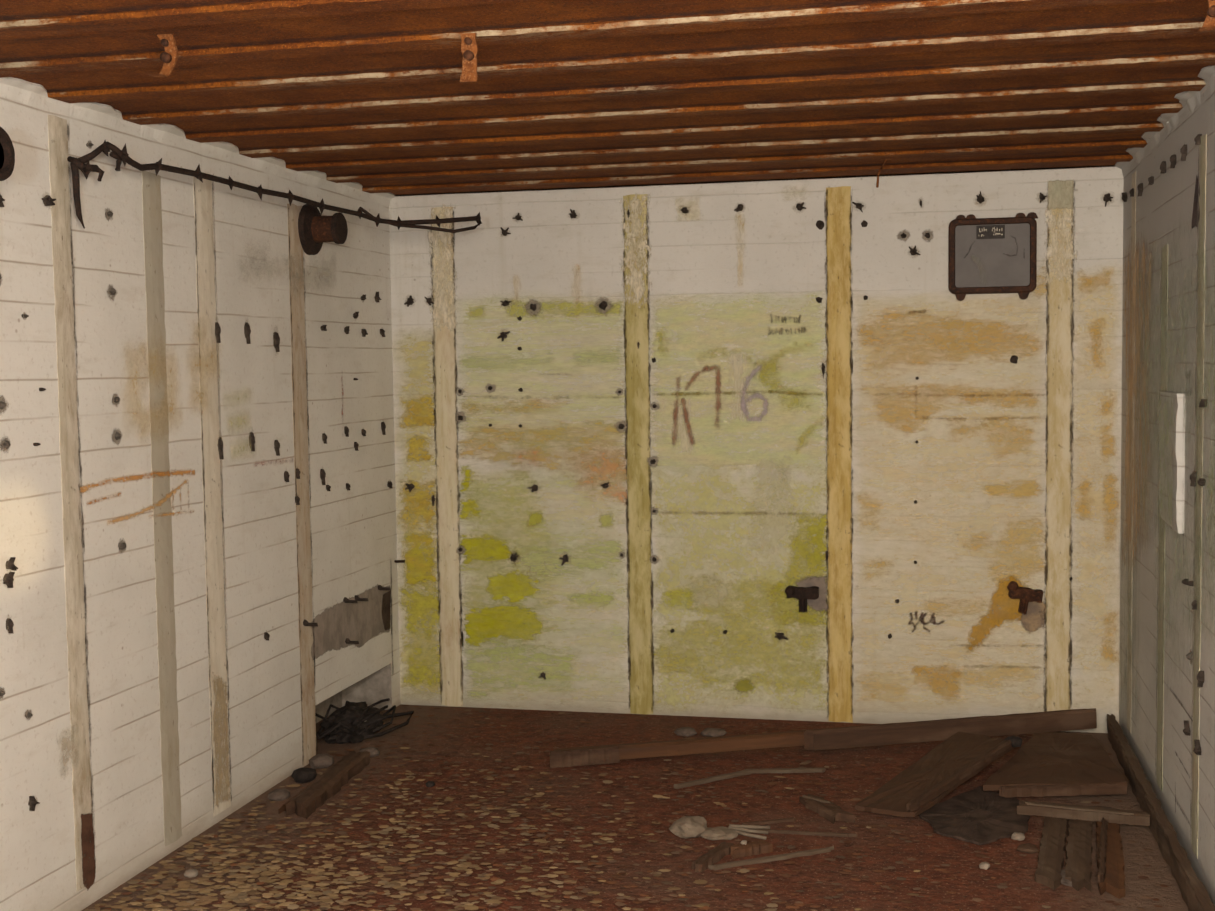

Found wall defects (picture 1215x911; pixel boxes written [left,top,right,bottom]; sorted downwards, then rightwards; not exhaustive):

rust [968,576,1024,650]